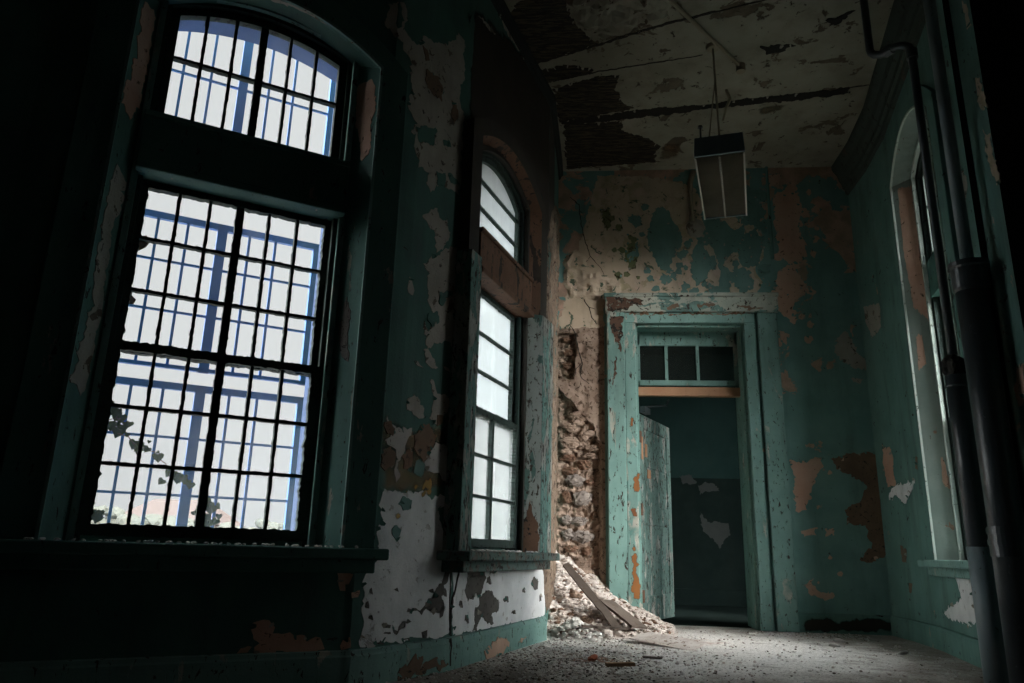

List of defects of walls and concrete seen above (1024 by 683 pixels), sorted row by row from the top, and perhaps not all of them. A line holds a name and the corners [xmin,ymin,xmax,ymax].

peeling [385,2,466,194]
flaking render [760,44,796,55]
spalling [337,173,822,659]
flaking render [789,444,918,563]
peeling [941,578,976,627]